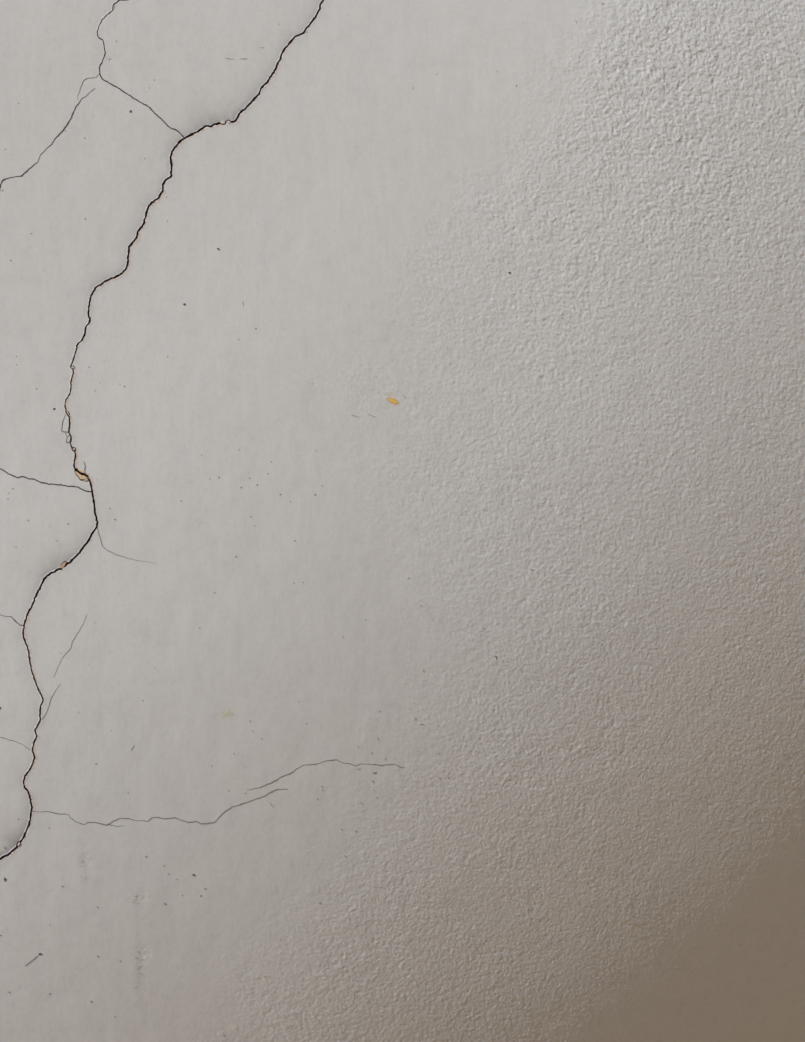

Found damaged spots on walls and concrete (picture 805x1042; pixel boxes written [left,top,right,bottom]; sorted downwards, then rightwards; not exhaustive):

crack [0,0,405,860]